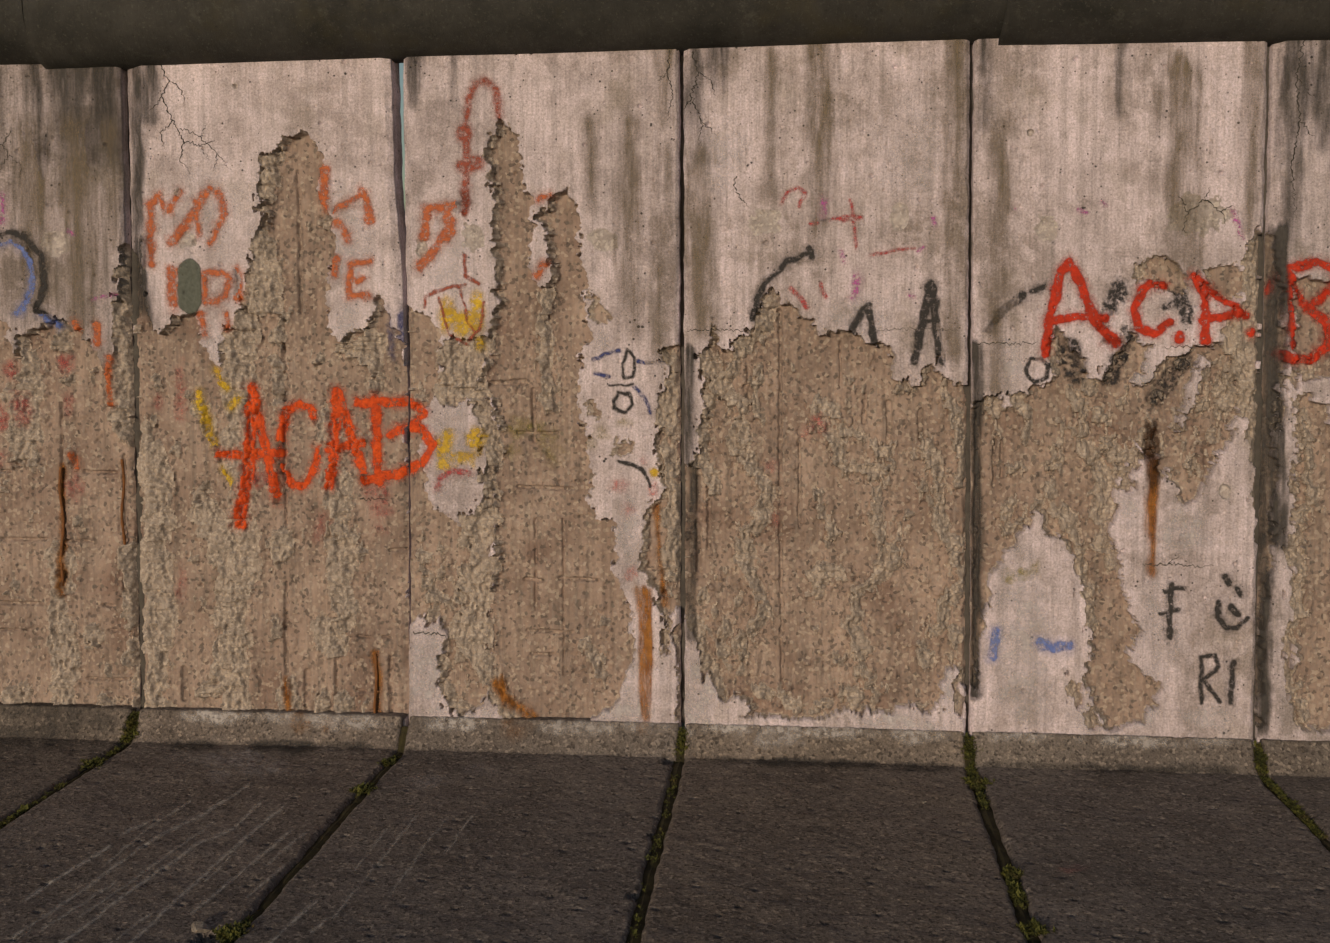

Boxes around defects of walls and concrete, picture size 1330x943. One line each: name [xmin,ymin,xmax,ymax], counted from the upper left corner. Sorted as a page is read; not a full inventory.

crack [151,65,225,171]
leakage [994,143,1009,210]
leakage [1169,53,1192,113]
leakage [1167,127,1196,229]
spalling [1166,191,1236,238]
rust [56,465,67,596]
spalling [0,118,636,718]
spalling [637,225,1330,735]
rust [1143,421,1160,575]
rust [636,504,665,719]